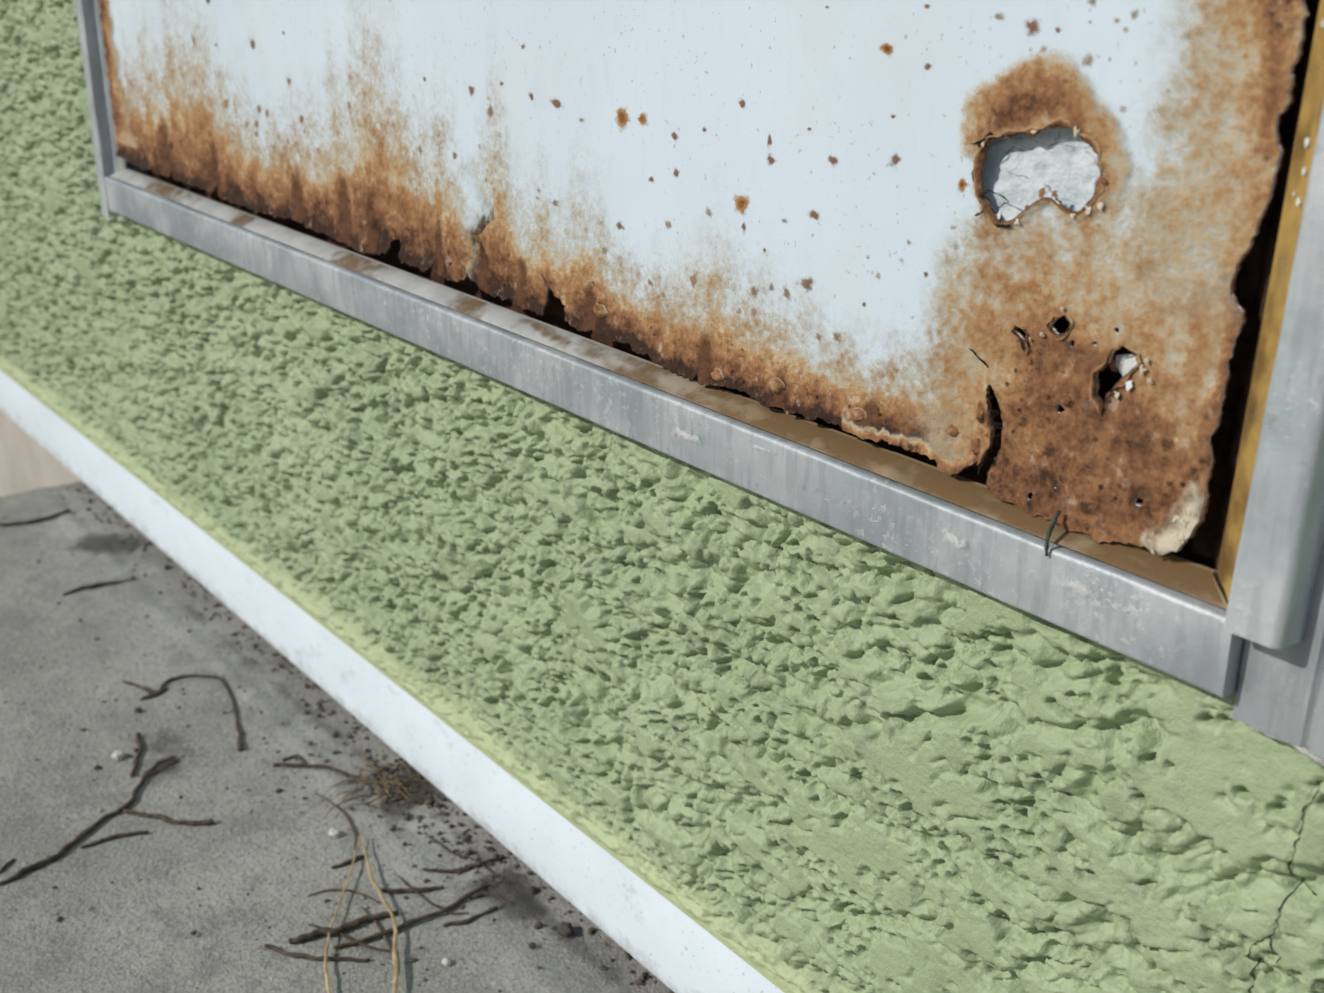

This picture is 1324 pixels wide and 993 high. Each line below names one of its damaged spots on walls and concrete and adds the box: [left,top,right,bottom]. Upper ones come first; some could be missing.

peeling [997,188,1059,225]
peeling [1070,202,1104,219]
rust [98,0,1324,601]
peeling [1114,358,1153,398]
crack [1246,781,1320,993]